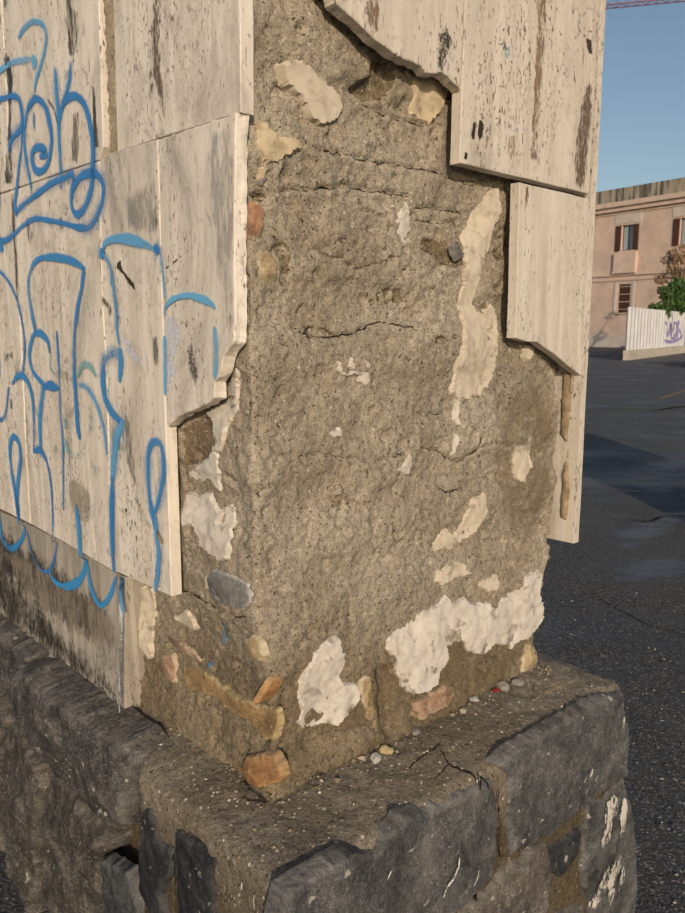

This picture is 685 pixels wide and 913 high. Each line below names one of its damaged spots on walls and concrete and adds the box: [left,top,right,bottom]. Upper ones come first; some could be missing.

peeling [274,59,448,126]
peeling [246,121,302,241]
crack [294,321,419,338]
peeling [390,186,504,400]
peeling [180,368,254,610]
crack [388,437,510,462]
peeling [432,492,488,551]
peeling [510,445,533,483]
water stain [1,543,124,713]
flaking render [157,633,291,788]
peeling [296,635,378,731]
peeling [385,562,544,720]